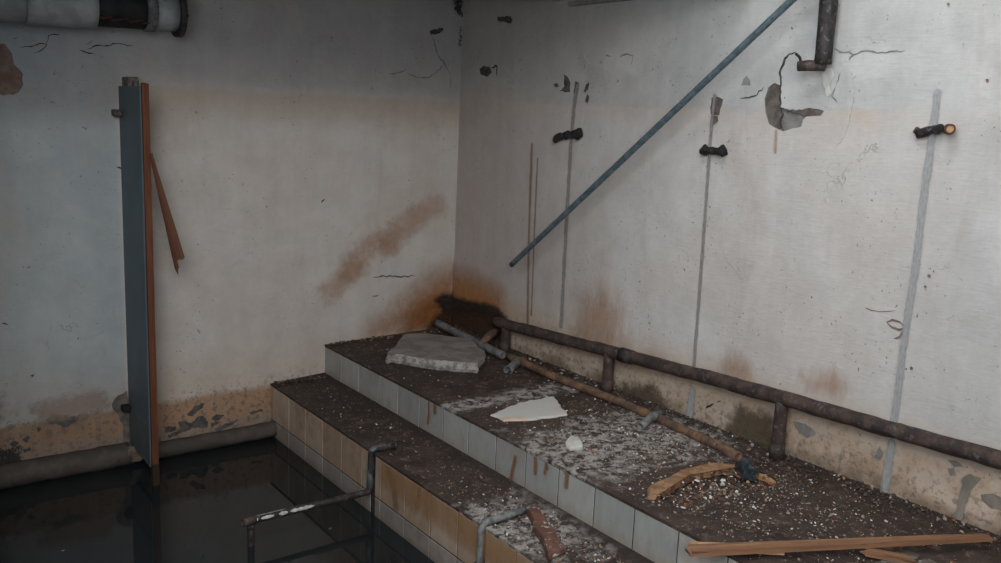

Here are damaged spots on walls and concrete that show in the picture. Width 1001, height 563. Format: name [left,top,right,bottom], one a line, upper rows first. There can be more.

peeling [0,44,23,96]
crack [14,34,59,53]
crack [81,40,132,55]
crack [831,48,905,102]
spalling [765,83,824,131]
peeling [165,403,238,438]